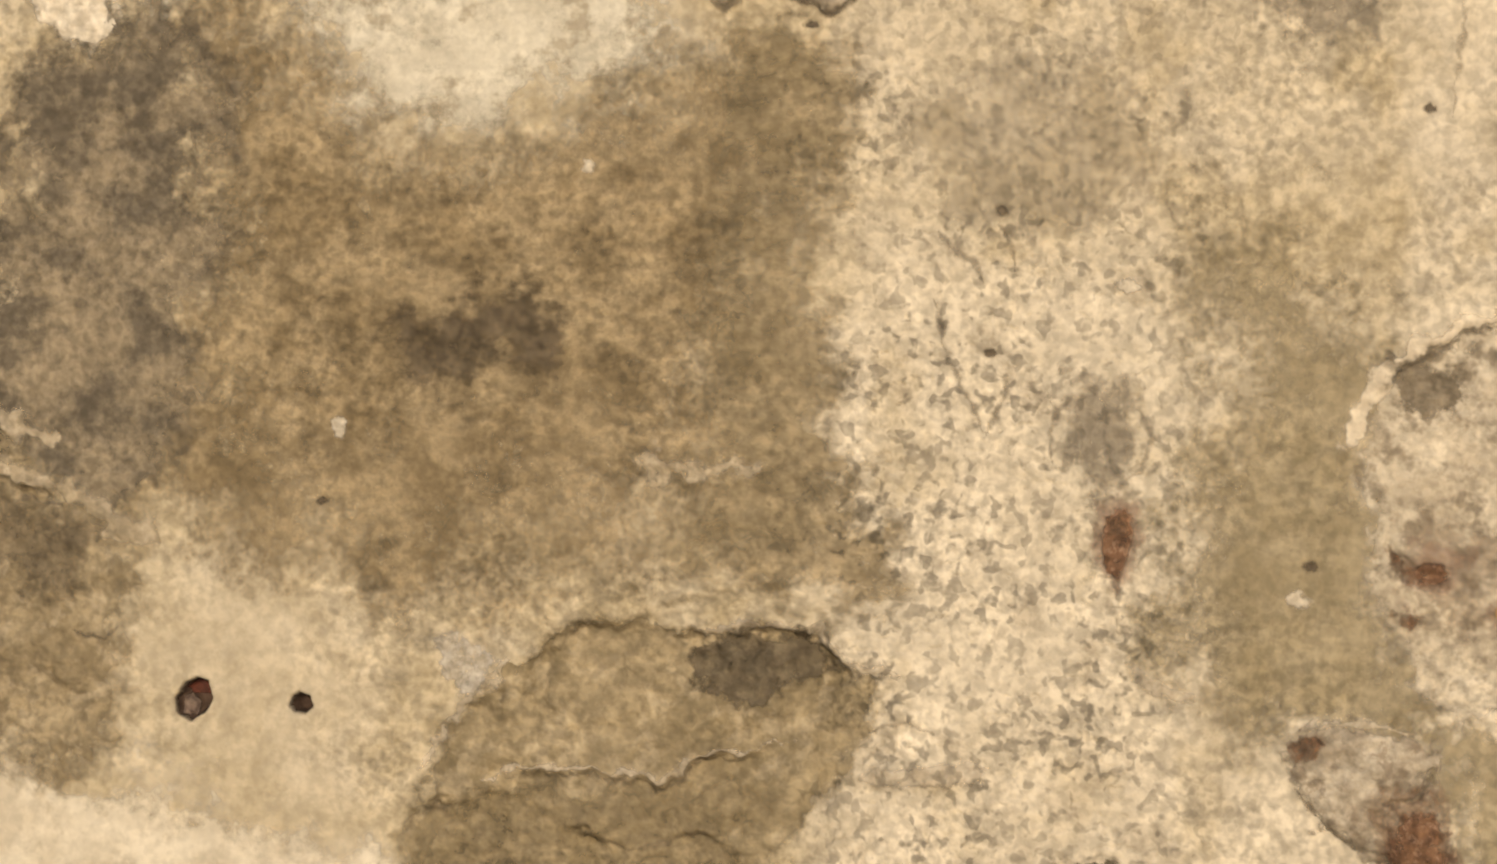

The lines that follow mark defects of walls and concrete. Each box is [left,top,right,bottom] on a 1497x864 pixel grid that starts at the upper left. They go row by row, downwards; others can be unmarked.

flaking render [29,0,122,56]
spalling [713,0,739,11]
spalling [798,0,847,17]
peeling [289,0,681,146]
leakage [0,0,909,619]
corrosion [1102,509,1133,580]
leakage [1130,224,1497,864]
spalling [1337,310,1497,731]
corrosion [1390,551,1447,586]
corrosion [1396,614,1418,630]
spalling [0,616,985,864]